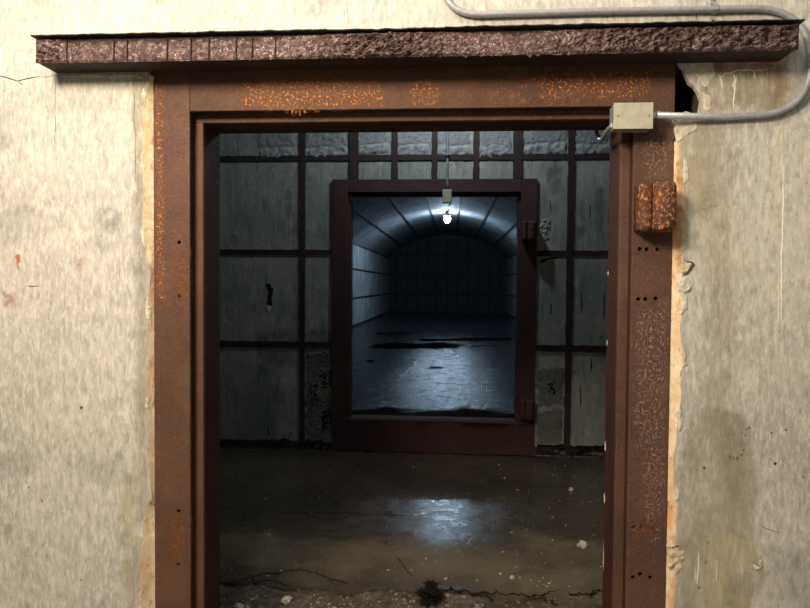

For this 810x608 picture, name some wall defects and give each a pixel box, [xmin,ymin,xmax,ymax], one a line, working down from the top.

crack [1,75,56,139]
corrosion [240,76,384,113]
corrosion [527,67,653,101]
peeling [690,63,716,111]
corrosion [155,84,164,298]
flaking render [60,72,155,608]
flaking render [665,119,698,608]
corrosion [633,302,669,541]
crack [234,569,349,586]
crack [439,586,603,606]